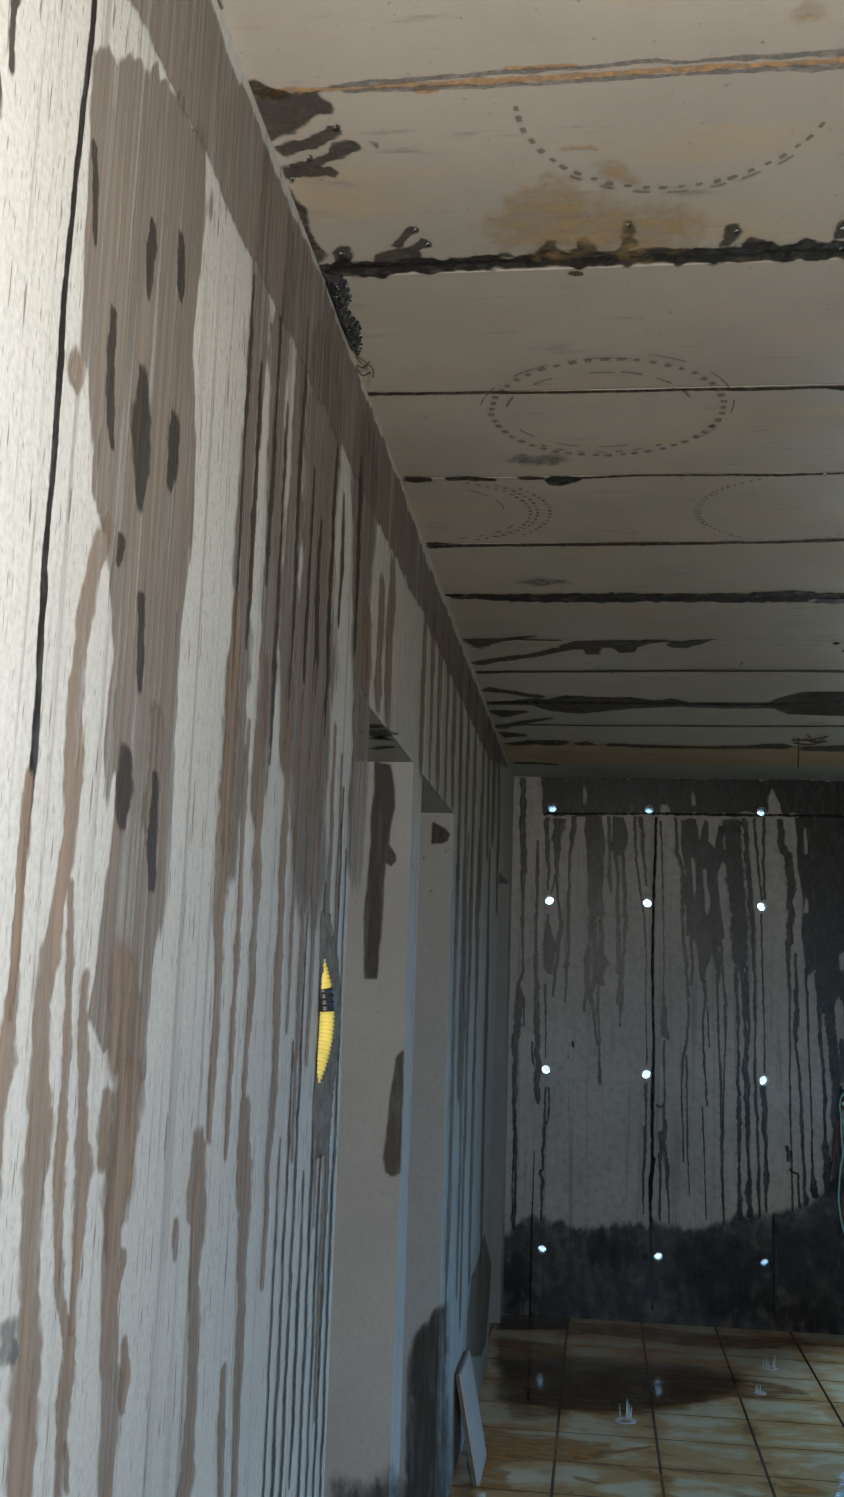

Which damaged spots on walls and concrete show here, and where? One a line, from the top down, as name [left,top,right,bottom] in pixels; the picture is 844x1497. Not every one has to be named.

rust [248,57,844,98]
leakage [318,220,844,279]
leakage [470,639,715,665]
leakage [481,687,844,716]
leakage [495,718,554,729]
leakage [8,0,508,1497]
leakage [503,777,844,1335]